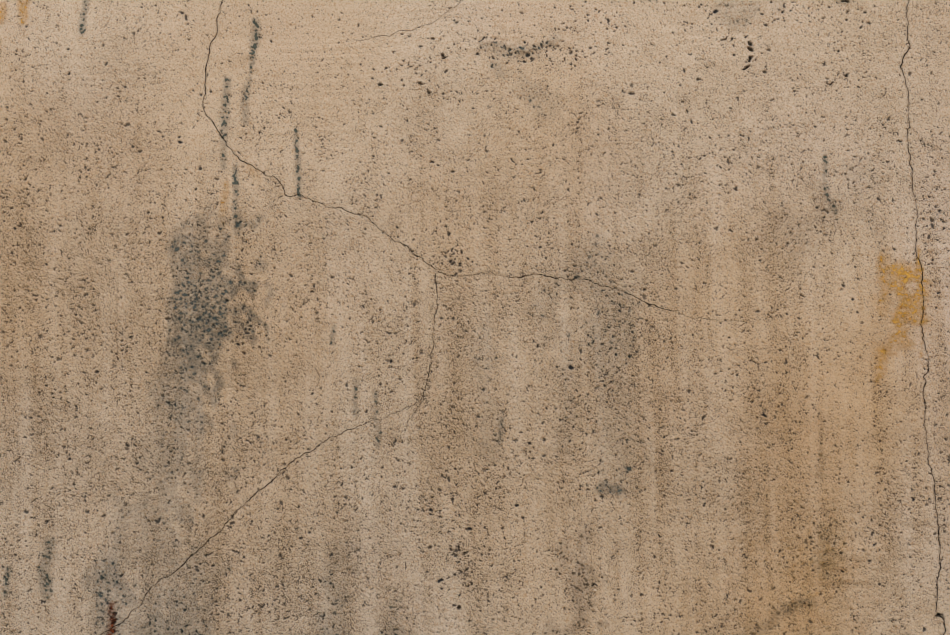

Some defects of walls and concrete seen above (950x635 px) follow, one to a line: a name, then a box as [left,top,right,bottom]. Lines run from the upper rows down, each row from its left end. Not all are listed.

water stain [244,18,260,100]
water stain [166,170,255,433]
crack [100,0,807,635]
rust [879,254,927,354]
crack [900,2,946,635]